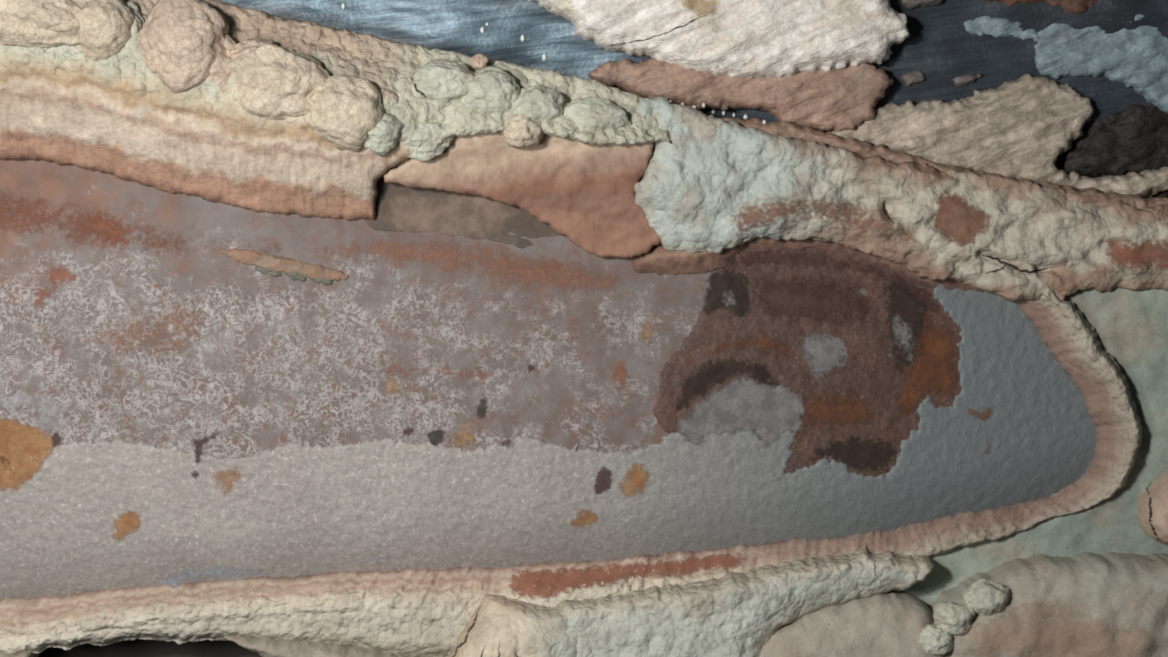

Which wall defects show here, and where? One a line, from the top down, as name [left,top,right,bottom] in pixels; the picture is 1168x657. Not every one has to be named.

rust [0,196,181,250]
spalling [365,175,565,249]
rust [0,419,54,490]
water stain [0,272,1142,657]
rust [113,512,140,540]
rust [509,553,741,598]
crack [453,607,480,657]